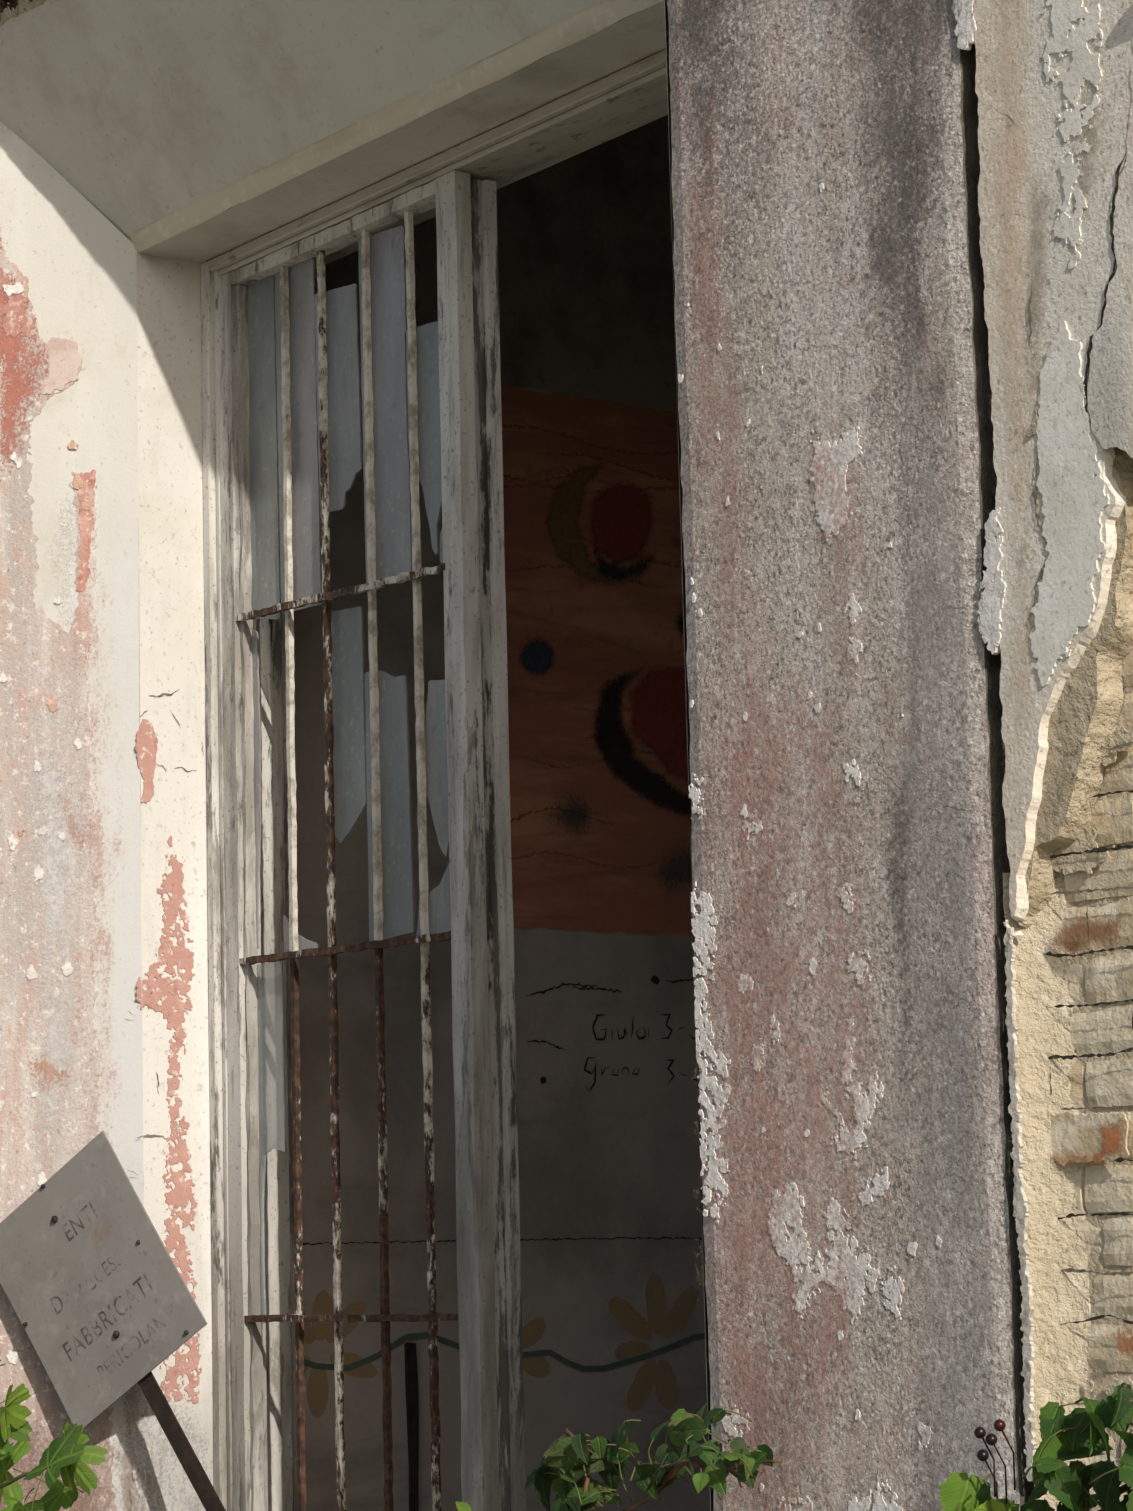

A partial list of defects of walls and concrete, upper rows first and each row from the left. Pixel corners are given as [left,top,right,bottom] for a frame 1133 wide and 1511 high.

peeling [1041,0,1104,269]
crack [1080,153,1128,424]
spalling [977,507,1006,655]
peeling [1025,321,1110,687]
peeling [0,237,121,1223]
peeling [134,719,158,803]
peeling [0,1283,117,1511]
peeling [135,836,198,1300]
peeling [159,1333,202,1403]
peeling [691,881,718,1058]
peeling [767,1166,942,1341]
spalling [1003,920,1039,1482]